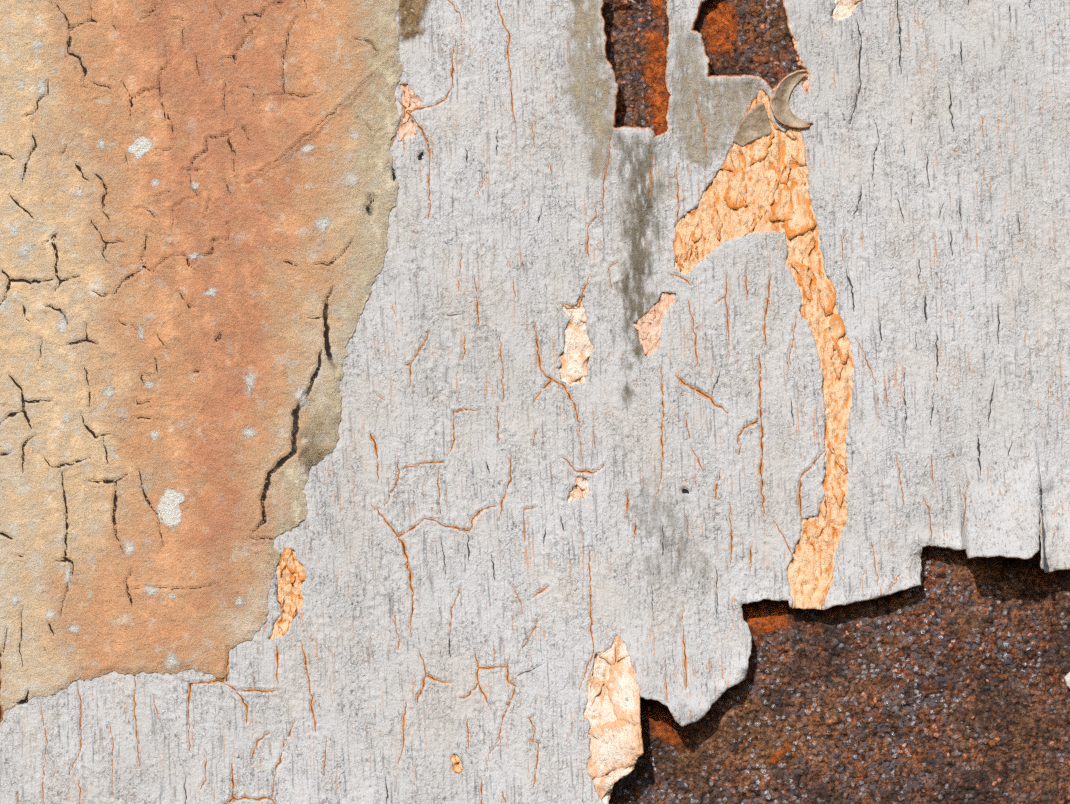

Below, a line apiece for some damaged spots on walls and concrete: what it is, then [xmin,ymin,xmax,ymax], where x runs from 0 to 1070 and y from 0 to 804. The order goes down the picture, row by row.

spalling [127,136,152,159]
spalling [398,84,423,142]
crack [0,0,327,804]
spalling [157,488,185,527]
spalling [269,548,306,640]
crack [249,238,354,541]
crack [369,246,564,804]
crack [534,322,605,474]
crack [579,546,594,689]
crack [656,269,825,617]
spalling [554,0,1070,804]
rust [609,520,1070,804]